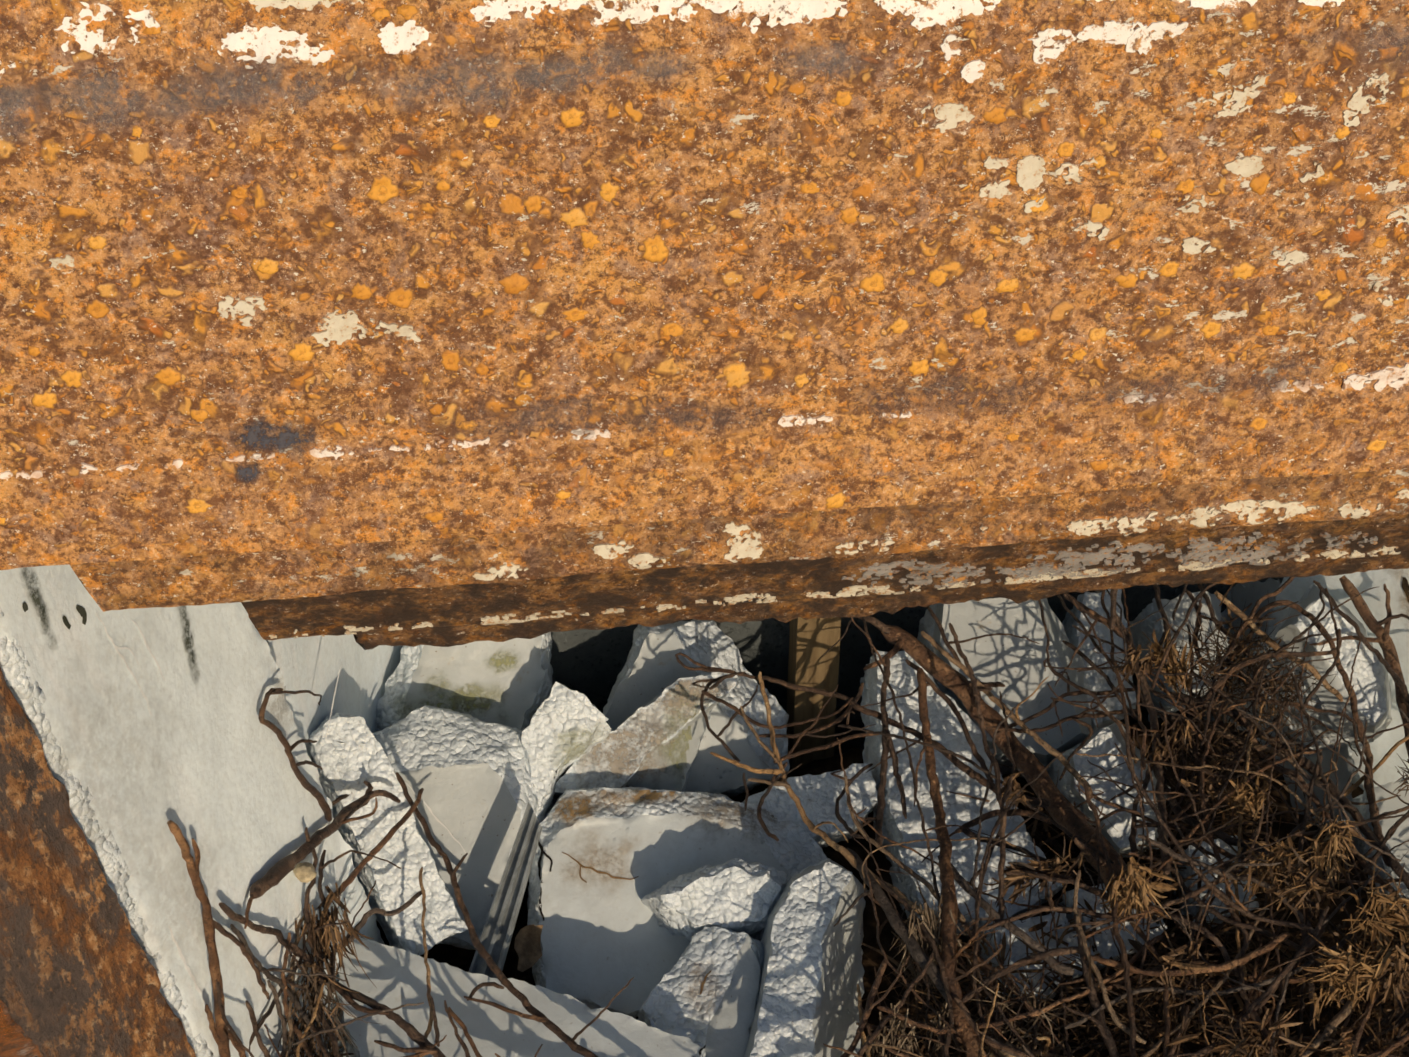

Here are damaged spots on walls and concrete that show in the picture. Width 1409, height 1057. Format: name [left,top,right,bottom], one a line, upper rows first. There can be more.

peeling [217,0,364,69]
peeling [377,20,432,54]
peeling [470,0,848,34]
peeling [873,0,1001,83]
peeling [1028,0,1257,64]
corrosion [560,107,585,128]
corrosion [366,175,400,204]
corrosion [560,207,601,250]
corrosion [350,282,413,309]
corrosion [31,369,83,409]
corrosion [722,362,751,388]
peeling [806,488,1409,599]